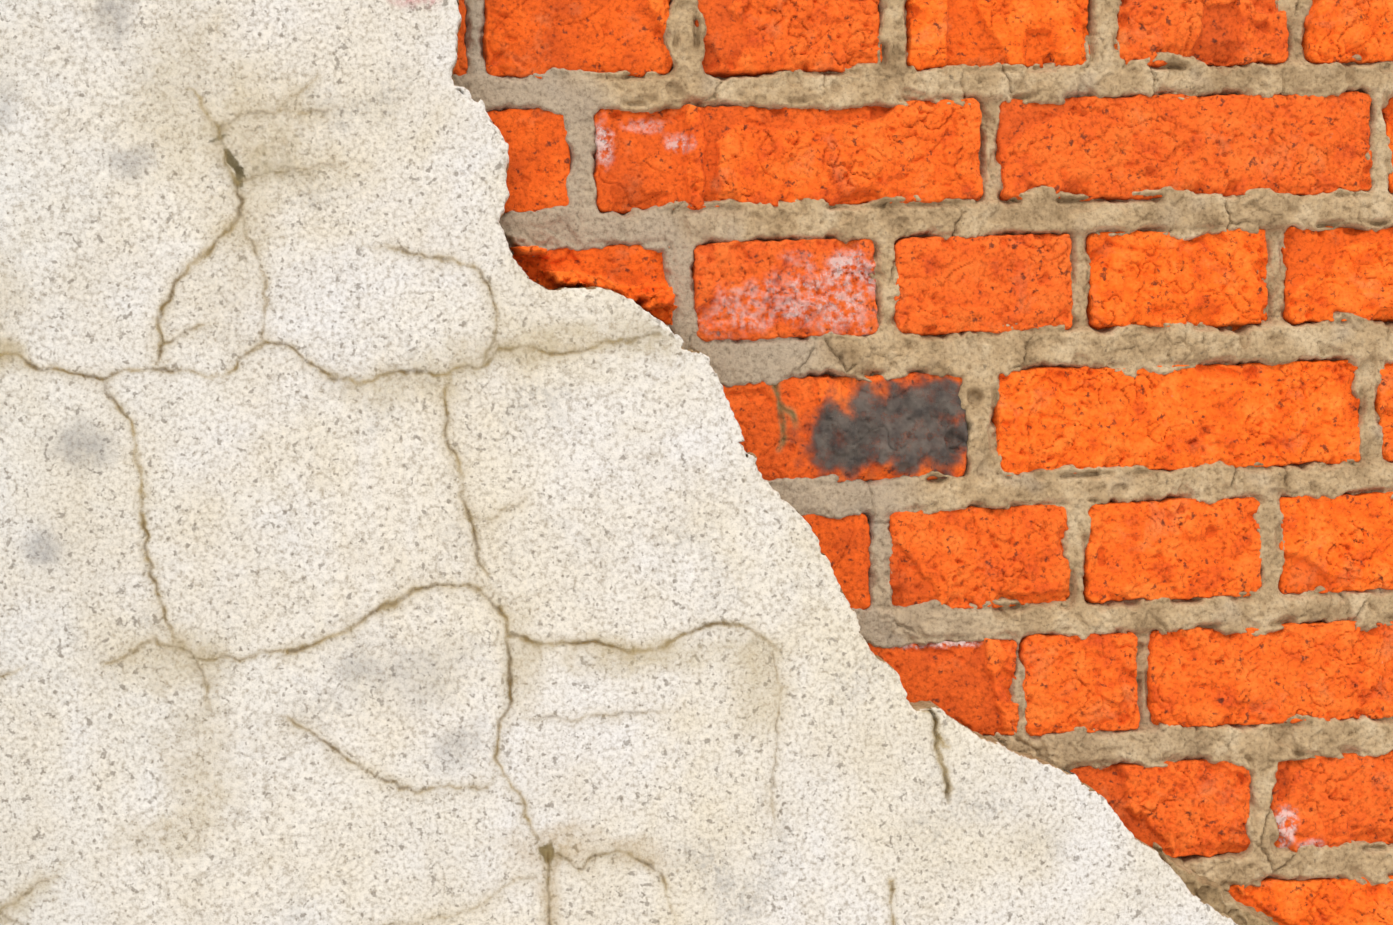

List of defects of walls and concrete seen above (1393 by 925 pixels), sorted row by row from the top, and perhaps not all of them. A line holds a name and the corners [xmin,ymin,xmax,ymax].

spalling [728,0,883,77]
spalling [685,91,1393,210]
spalling [509,228,1393,342]
crack [772,384,797,446]
spalling [992,359,1393,476]
crack [0,96,743,925]
spalling [889,497,1262,609]
spalling [1279,492,1393,594]
spalling [984,620,1393,736]
crack [926,710,950,795]
spalling [1120,759,1251,858]
crack [888,880,896,925]